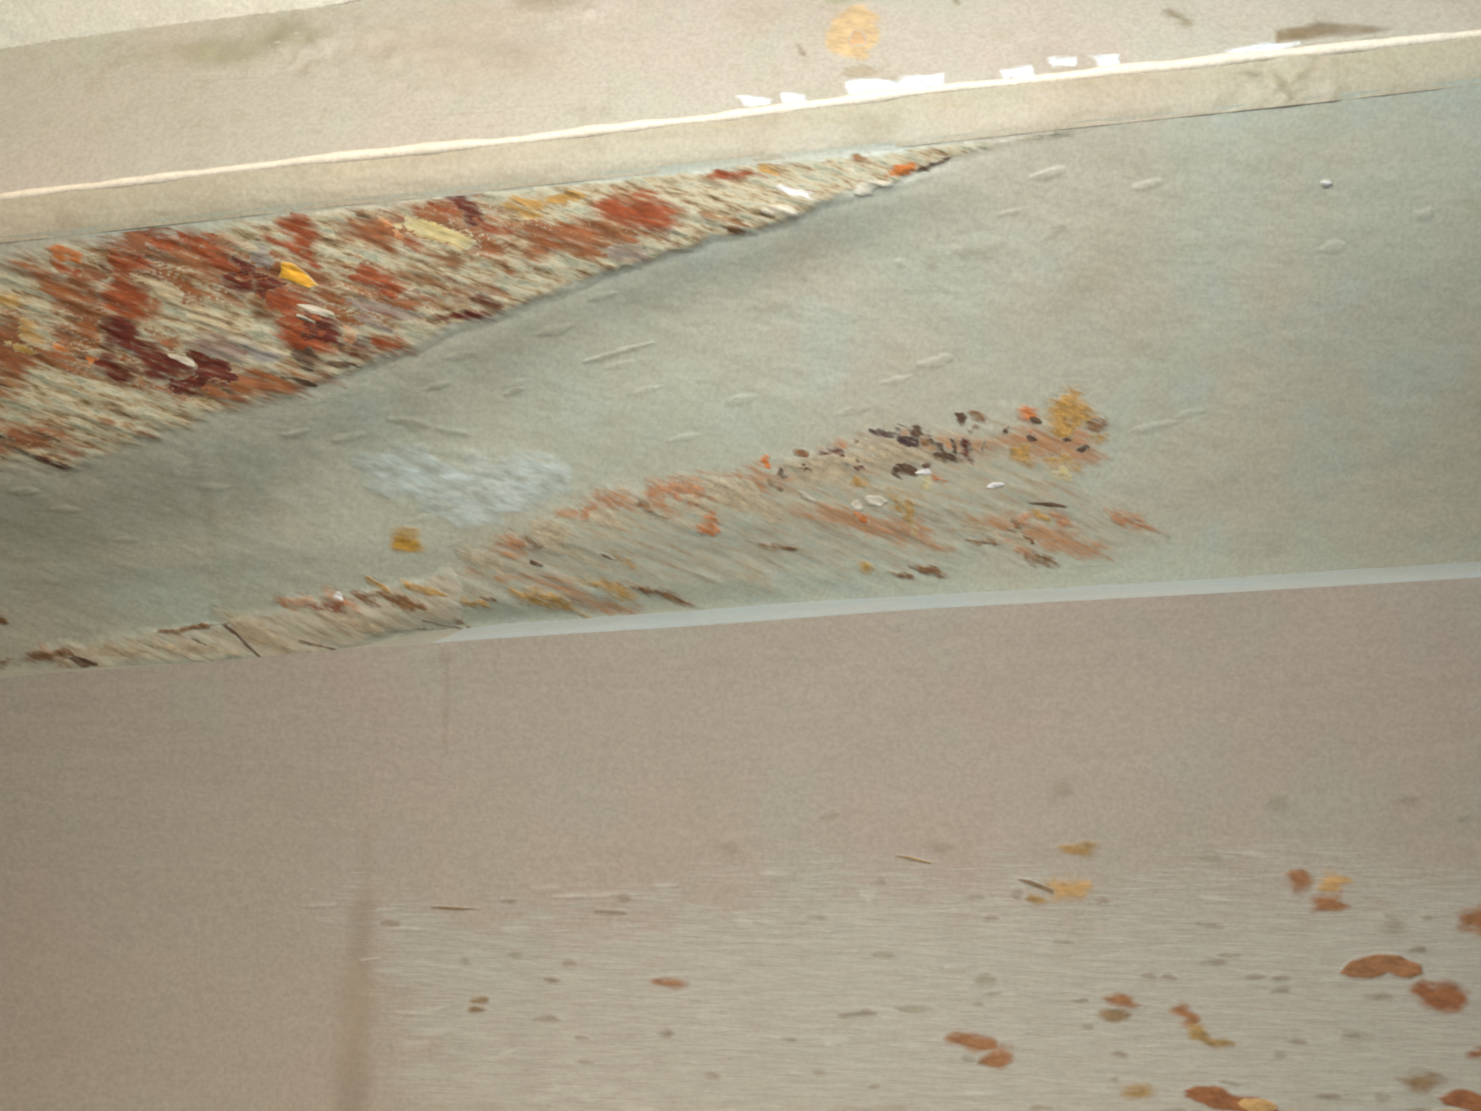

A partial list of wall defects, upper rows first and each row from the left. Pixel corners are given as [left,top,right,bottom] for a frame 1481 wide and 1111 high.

rust [818,0,888,80]
rust [378,383,1172,631]
rust [1023,836,1108,911]
rust [1272,861,1362,918]
rust [1449,896,1481,947]
rust [937,1023,1022,1078]
rust [1088,987,1242,1055]
rust [1111,1074,1282,1111]
rust [1335,951,1478,1026]
rust [1378,1038,1481,1111]